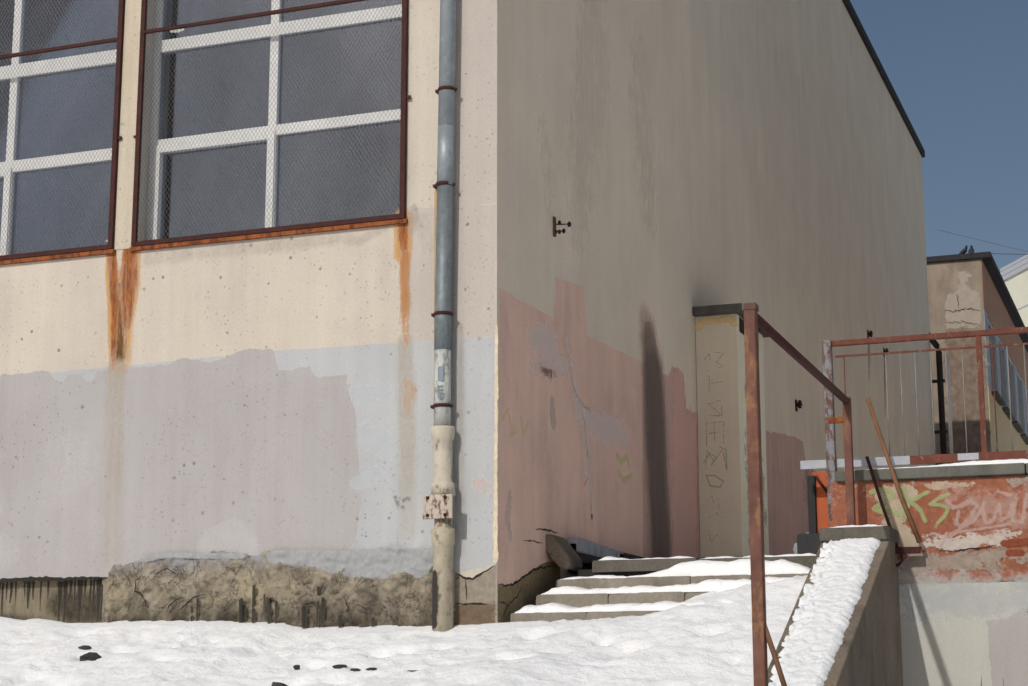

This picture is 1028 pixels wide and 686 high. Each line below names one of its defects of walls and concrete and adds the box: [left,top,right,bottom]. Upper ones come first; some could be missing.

corrosion [105,249,140,374]
corrosion [394,211,413,346]
peeling [827,475,1028,584]
leakage [0,579,103,623]